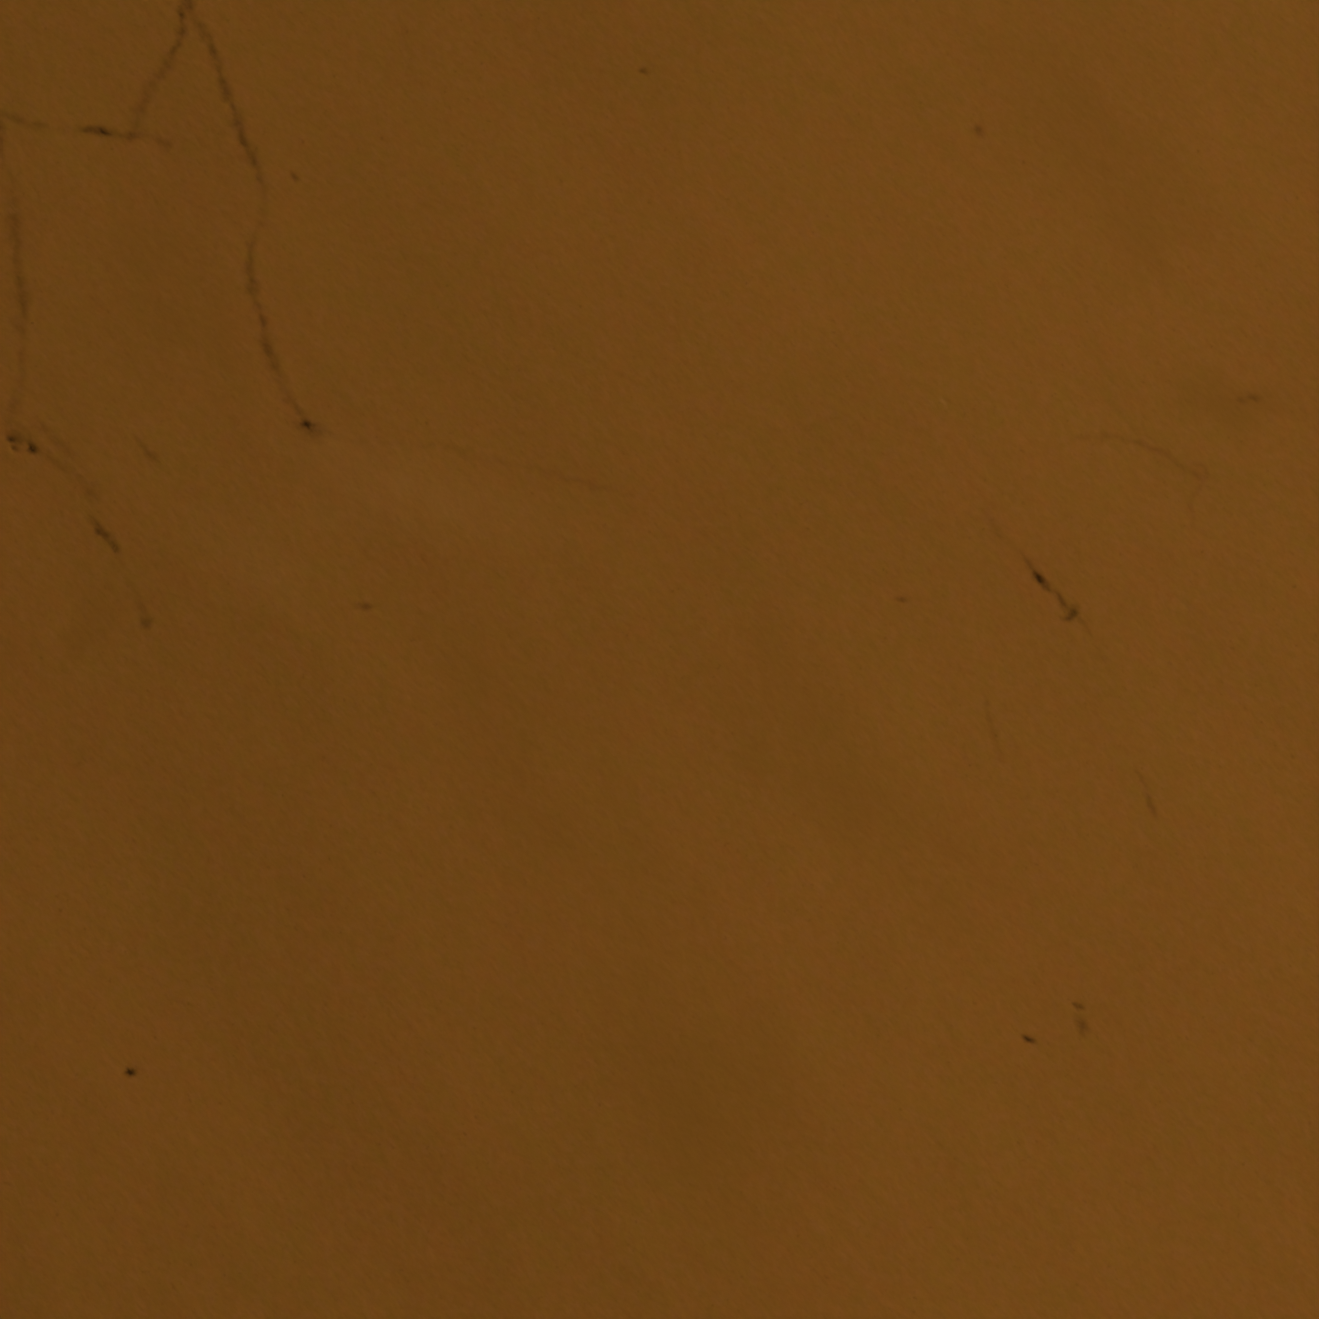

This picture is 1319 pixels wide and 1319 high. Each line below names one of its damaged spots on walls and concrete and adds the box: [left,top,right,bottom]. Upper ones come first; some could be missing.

crack [125,0,337,446]
crack [977,502,1124,684]